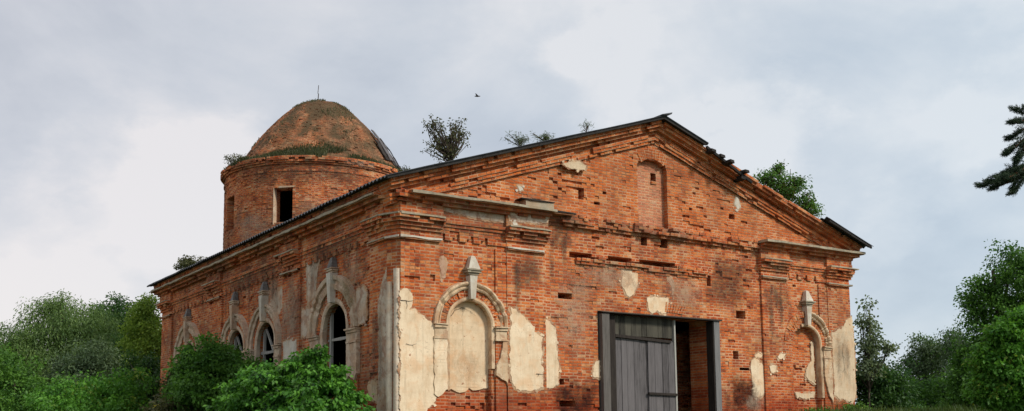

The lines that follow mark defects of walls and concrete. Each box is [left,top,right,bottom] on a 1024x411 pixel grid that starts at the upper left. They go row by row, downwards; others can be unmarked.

spalling [462,159,606,205]